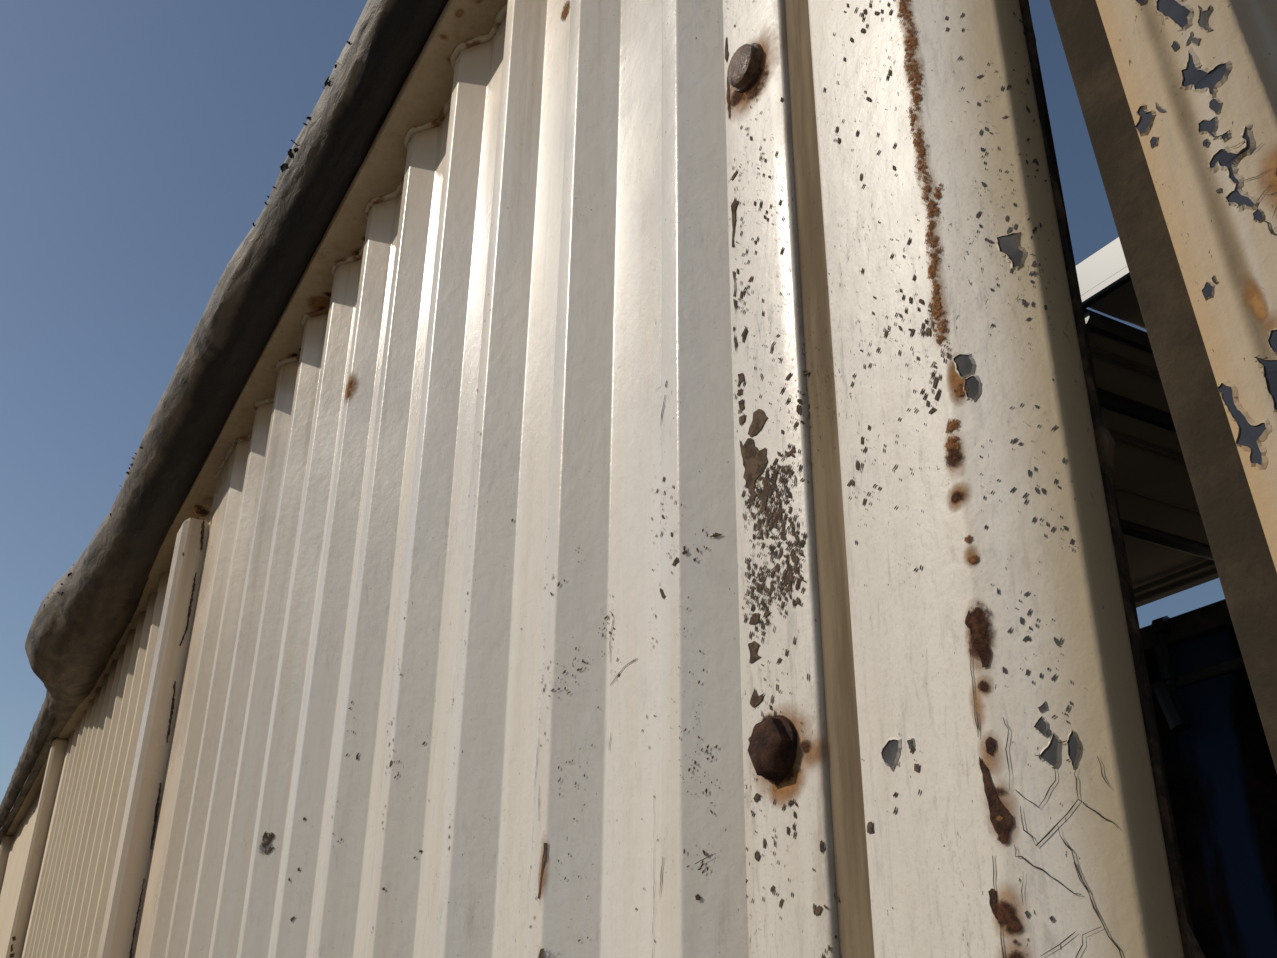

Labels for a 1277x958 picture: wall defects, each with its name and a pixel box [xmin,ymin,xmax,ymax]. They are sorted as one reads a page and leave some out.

corrosion [726,40,769,118]
peeling [823,0,901,93]
peeling [1135,0,1265,223]
corrosion [897,0,950,354]
crack [1230,142,1277,235]
peeling [1201,275,1218,300]
peeling [1217,328,1277,469]
corrosion [762,713,823,802]
peeling [881,737,919,772]
corrosion [965,601,1013,844]
crack [1003,718,1122,958]
corrosion [988,856,1023,958]